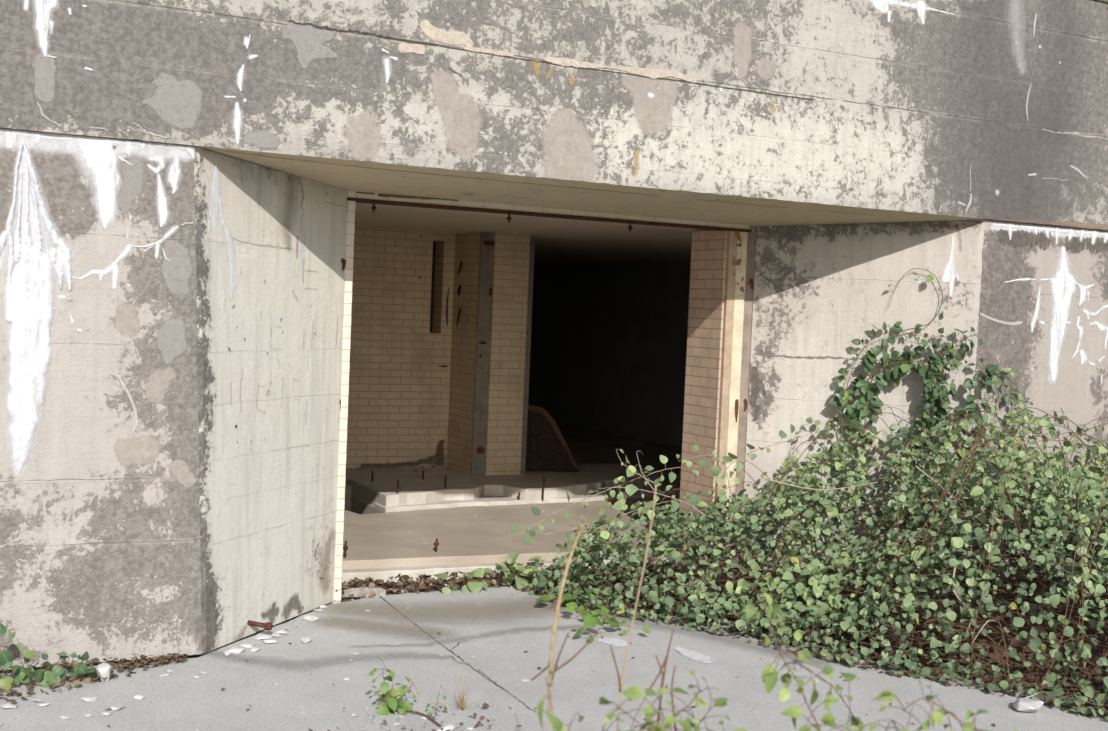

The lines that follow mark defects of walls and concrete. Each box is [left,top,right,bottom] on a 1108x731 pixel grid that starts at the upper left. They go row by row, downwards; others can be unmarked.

water stain [24,0,86,58]
water stain [224,35,258,144]
crack [288,20,815,100]
water stain [869,0,954,24]
water stain [0,129,195,228]
water stain [991,219,1108,383]
water stain [750,366,766,421]
crack [380,596,536,712]